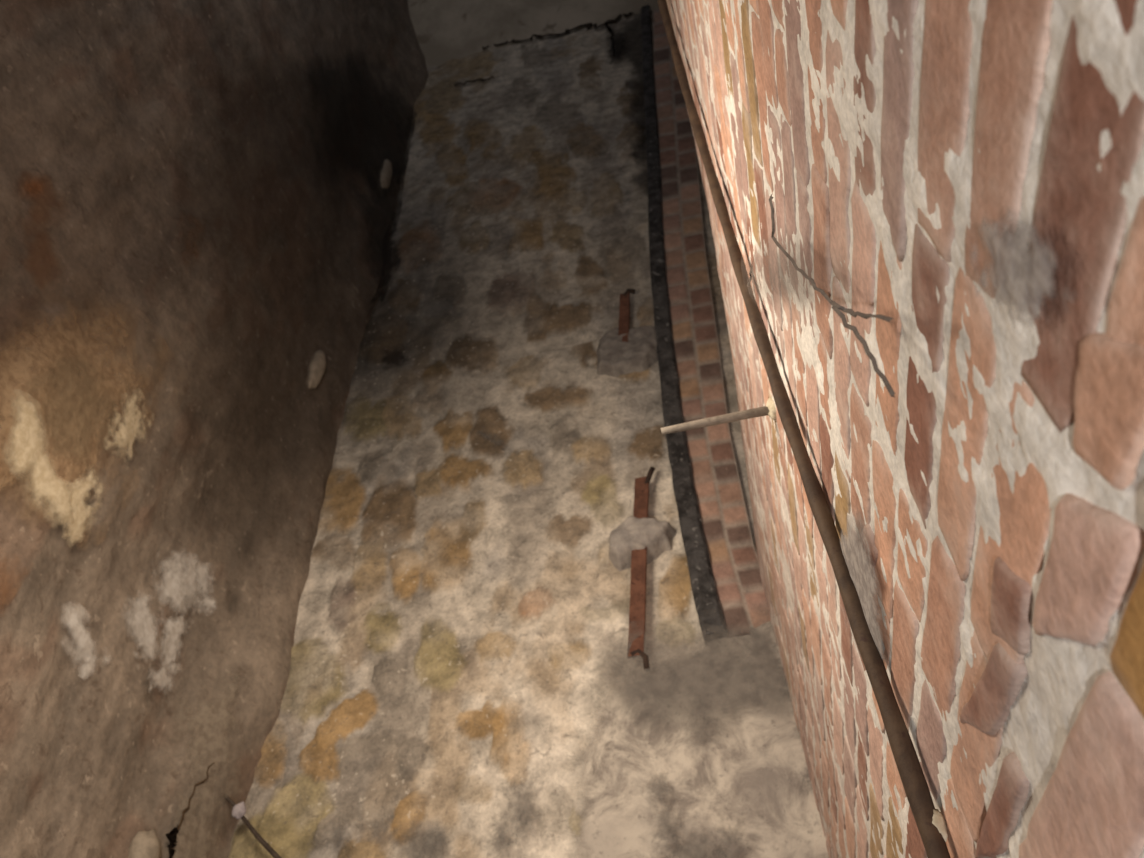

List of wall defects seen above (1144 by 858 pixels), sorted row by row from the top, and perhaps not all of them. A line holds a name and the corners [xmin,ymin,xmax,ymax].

crack [482,12,633,55]
efflorescence [65,608,109,677]
efflorescence [129,554,215,688]
crack [165,762,215,858]